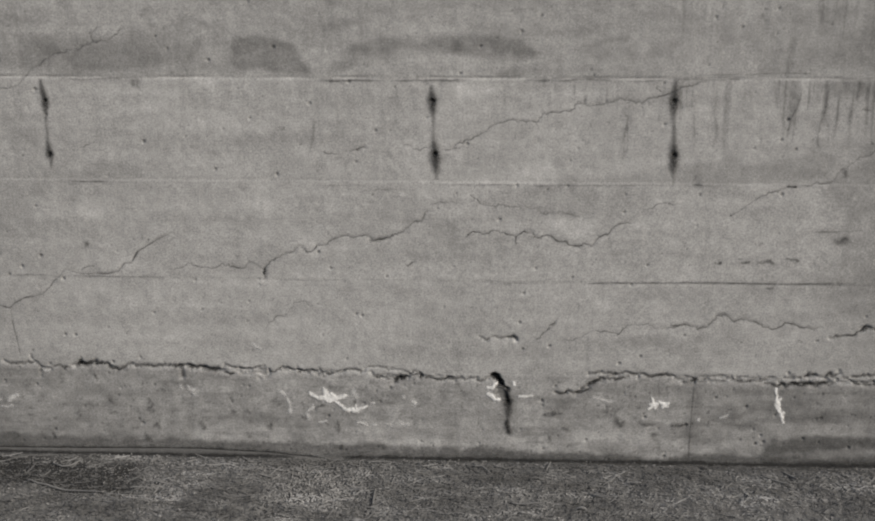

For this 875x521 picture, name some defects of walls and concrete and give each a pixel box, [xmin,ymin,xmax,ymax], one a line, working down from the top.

crack [64,361,234,376]
crack [558,372,671,394]
crack [740,372,870,387]
water stain [307,387,376,425]
water stain [648,397,670,410]
water stain [774,388,784,423]